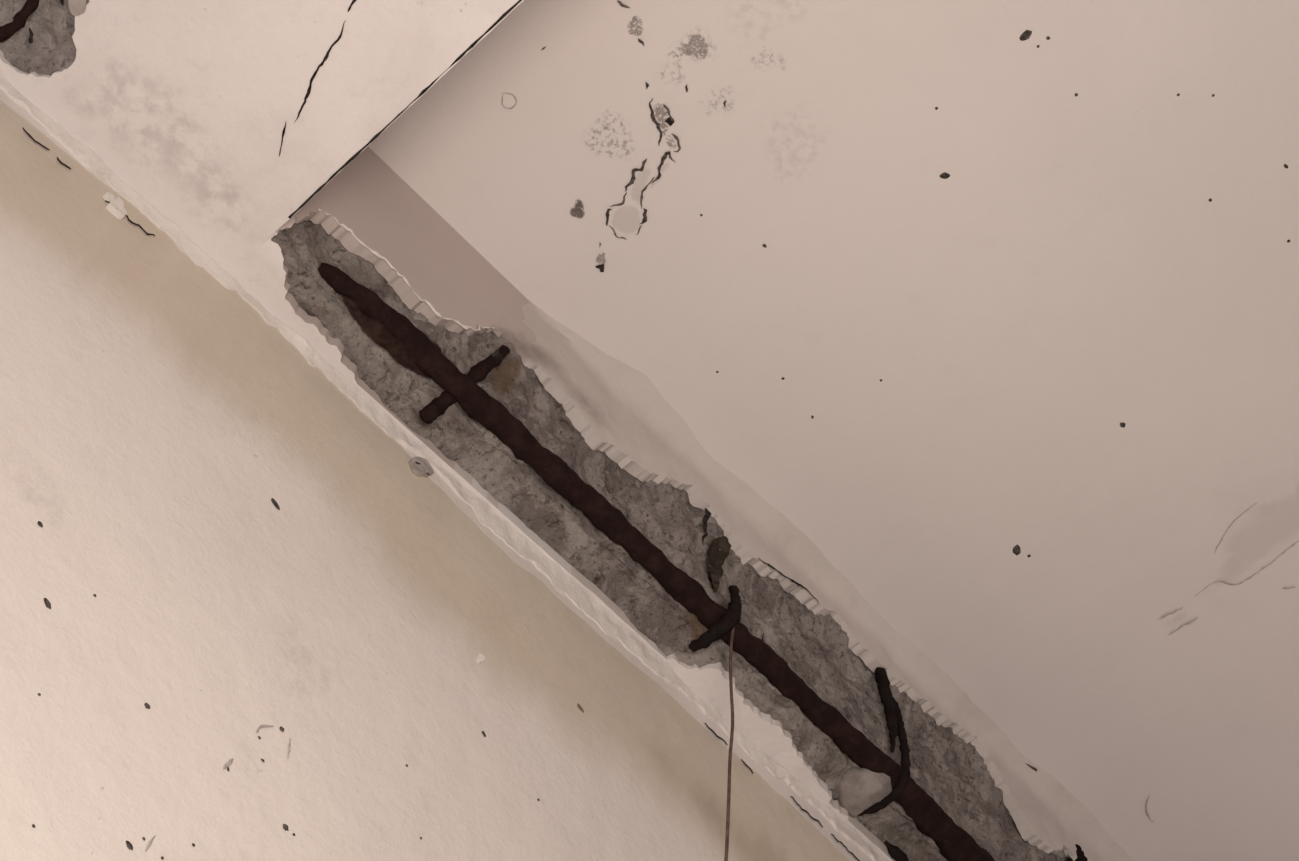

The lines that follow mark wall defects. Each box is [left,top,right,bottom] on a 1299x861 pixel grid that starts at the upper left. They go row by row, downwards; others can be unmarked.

spalling [0,0,89,76]
peeling [617,0,644,46]
peeling [684,35,707,58]
flaking render [1019,30,1050,48]
crack [279,0,522,218]
corrosion [342,295,432,379]
spalling [0,71,1067,861]
corrosion [690,614,705,640]